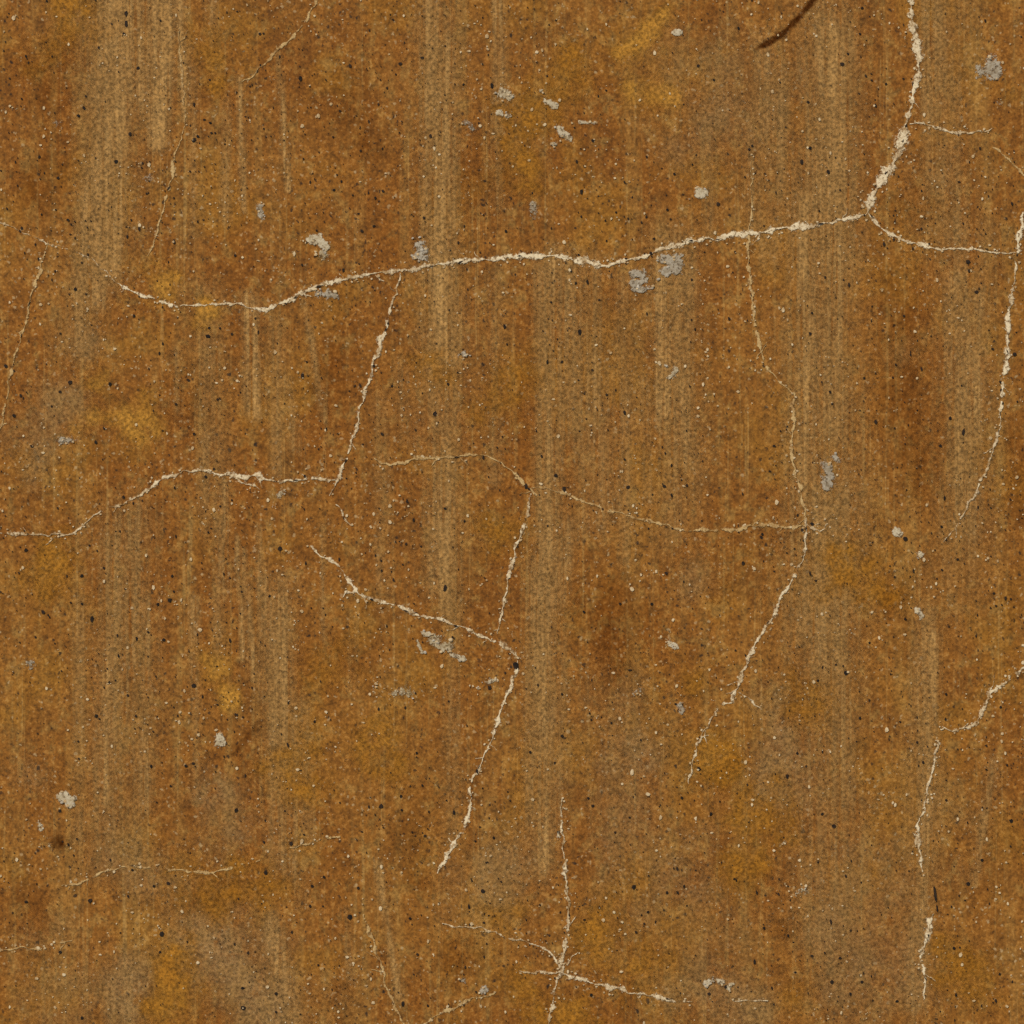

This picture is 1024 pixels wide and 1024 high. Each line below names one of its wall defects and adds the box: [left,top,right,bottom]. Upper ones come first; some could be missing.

corrosion [613,6,670,58]
corrosion [759,0,815,48]
crack [0,221,67,428]
crack [79,0,1024,873]
crack [0,511,101,545]
corrosion [201,655,241,710]
corrosion [695,738,742,783]
crack [911,667,1024,999]
crack [62,858,260,891]
crack [442,797,692,1024]
crack [0,940,72,955]
corrosion [142,944,193,1023]